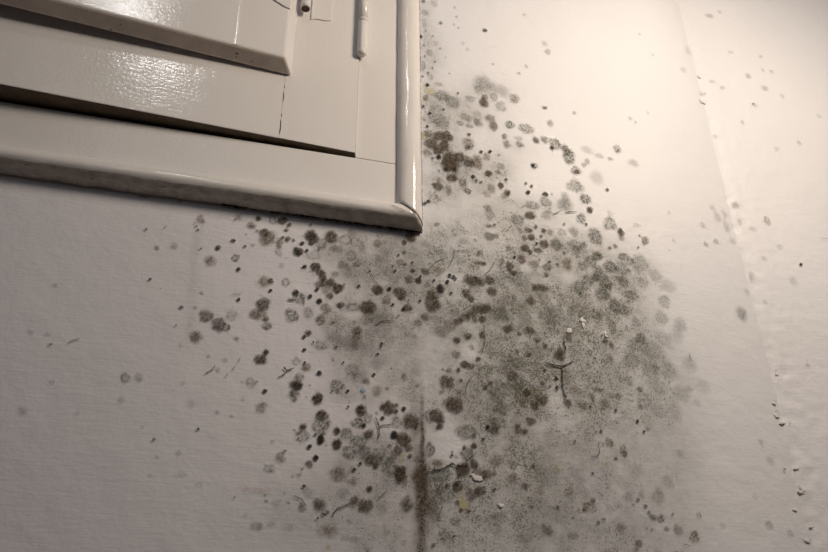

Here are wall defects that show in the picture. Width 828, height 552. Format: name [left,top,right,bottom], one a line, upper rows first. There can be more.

damp [200,311,230,331]
damp [249,72,684,552]